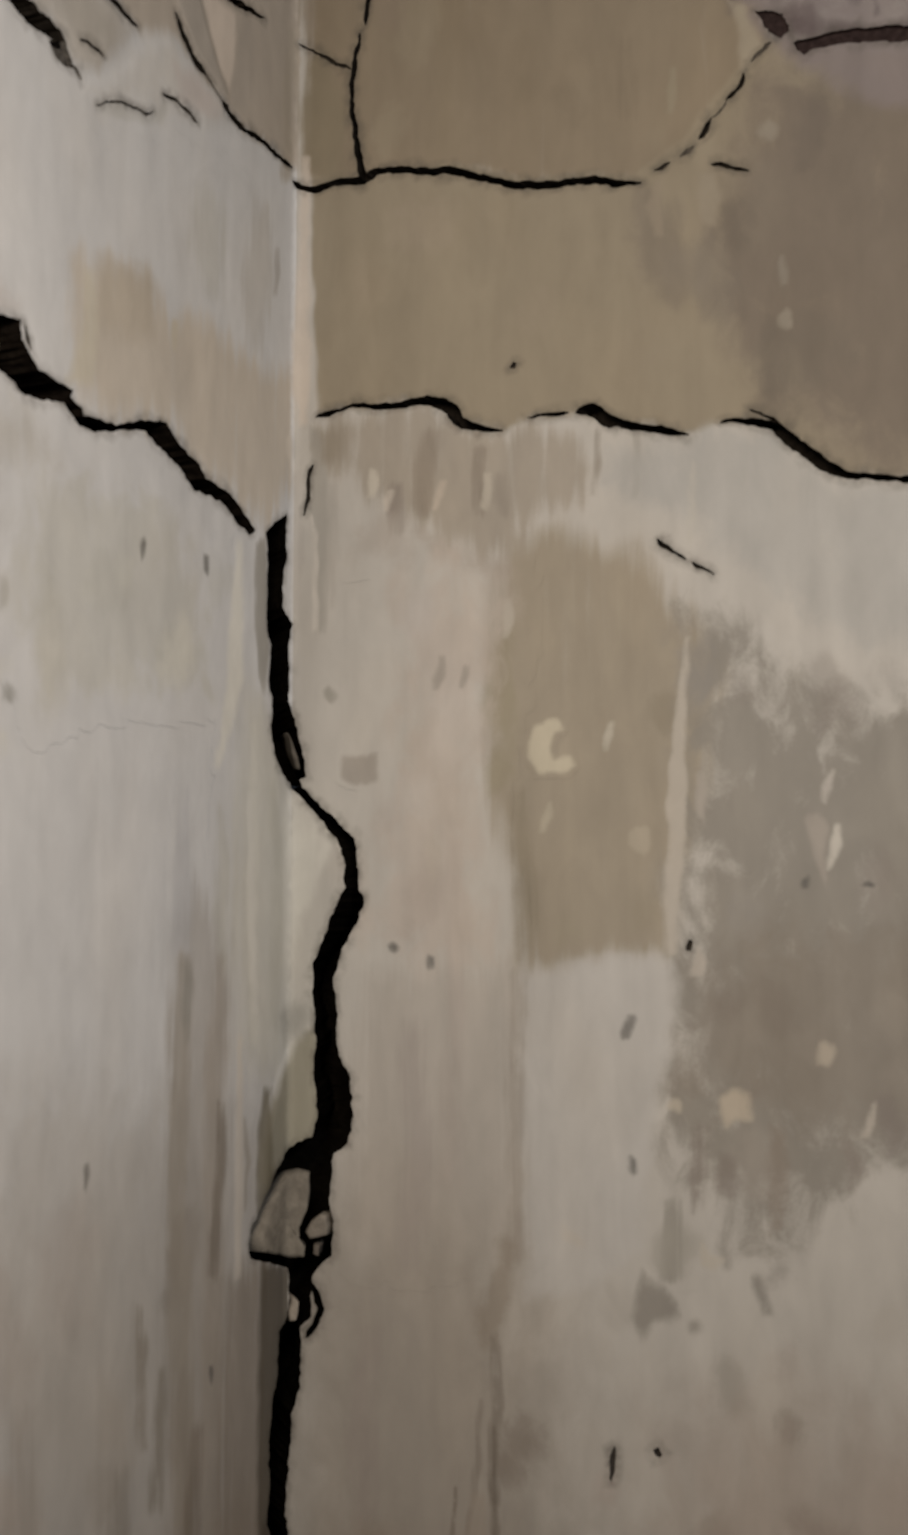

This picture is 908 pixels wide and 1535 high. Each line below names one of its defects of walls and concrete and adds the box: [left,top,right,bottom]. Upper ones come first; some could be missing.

leakage [0,154,345,1535]
crack [0,314,364,1535]
crack [9,0,771,194]
leakage [285,69,908,1535]
crack [315,395,908,483]
crack [656,539,714,576]